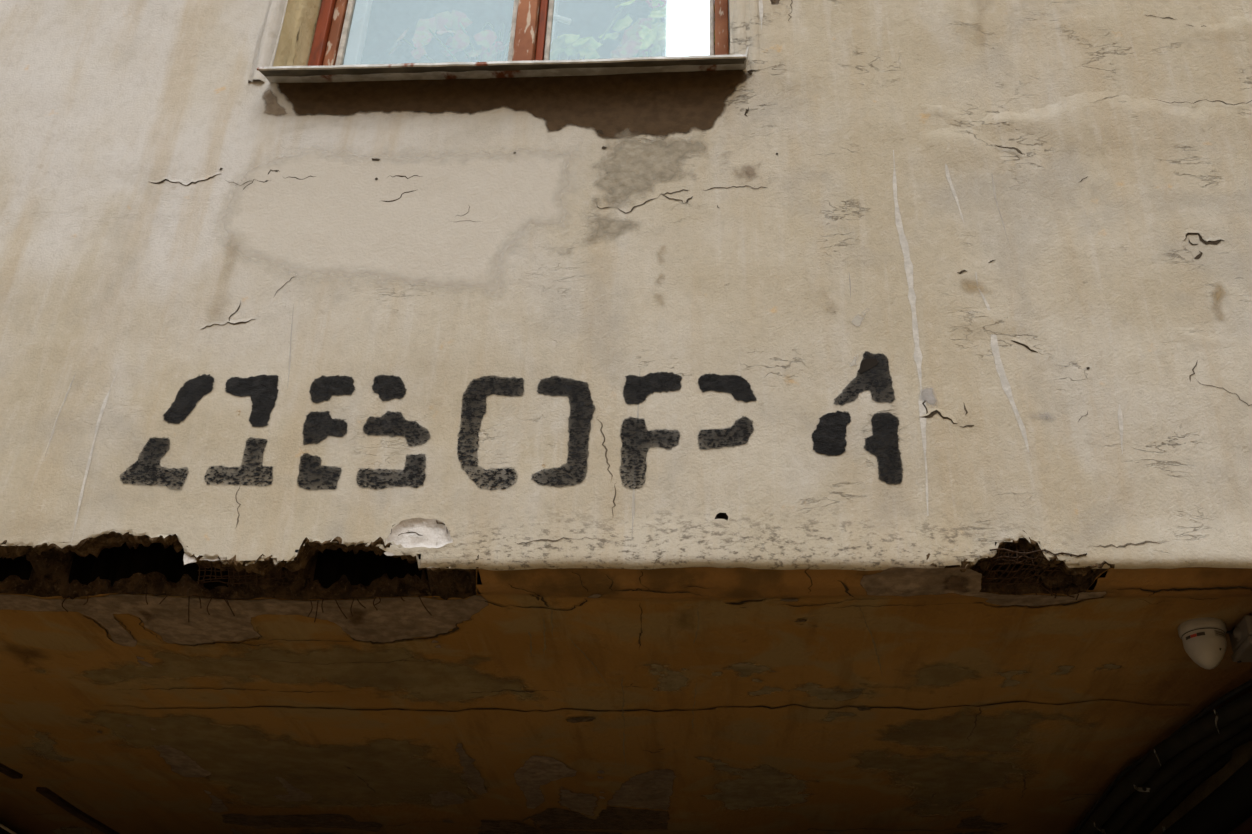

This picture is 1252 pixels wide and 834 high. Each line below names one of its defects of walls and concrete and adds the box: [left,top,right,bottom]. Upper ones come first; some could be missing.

spalling [766,0,784,8]
crack [149,169,316,191]
crack [592,185,767,213]
crack [1189,360,1252,406]
crack [596,418,616,514]
crack [390,520,448,536]
crack [515,536,591,544]
crack [1094,540,1169,548]
spalling [0,513,488,647]
crack [84,556,1252,647]
spalling [860,530,1115,606]
crack [104,683,1186,741]